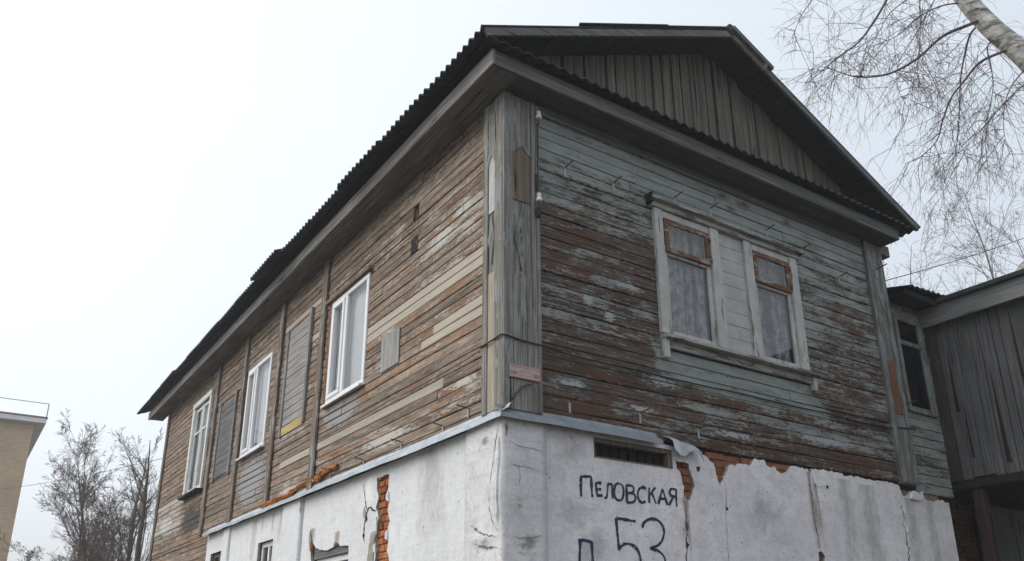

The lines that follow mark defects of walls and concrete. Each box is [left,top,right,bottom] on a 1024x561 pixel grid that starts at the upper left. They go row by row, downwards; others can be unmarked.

peeling [354,422,416,454]
flaking render [676,452,751,505]
flaking render [765,462,789,473]
crack [362,483,376,556]
flaking render [367,475,390,561]